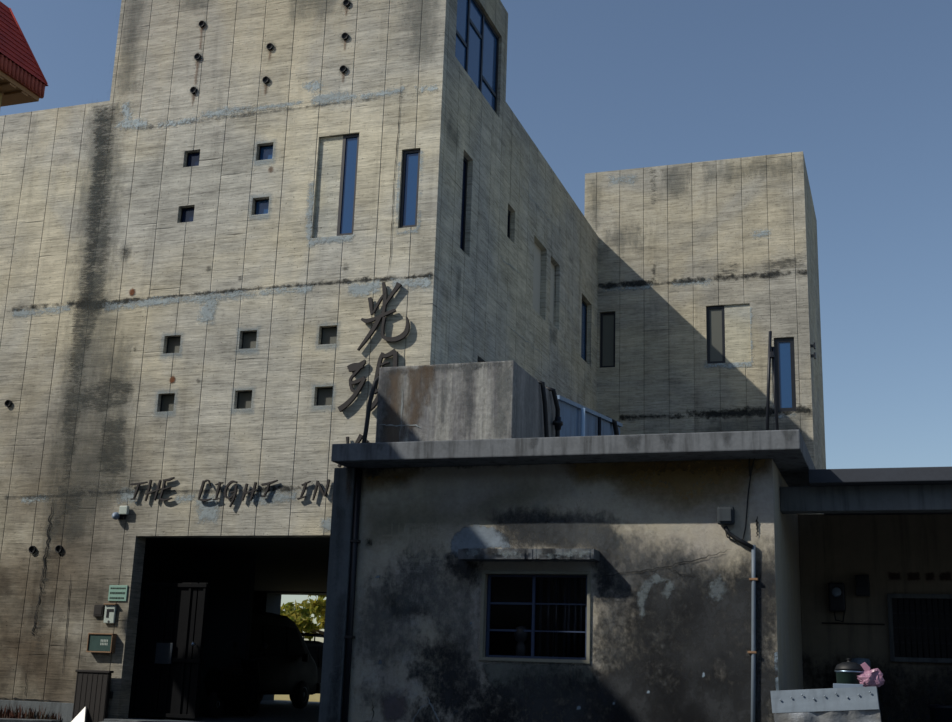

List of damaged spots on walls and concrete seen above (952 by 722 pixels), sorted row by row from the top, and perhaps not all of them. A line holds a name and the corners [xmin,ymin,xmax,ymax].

leakage [13,106,311,473]
leakage [348,278,431,297]
crack [256,484,300,492]
crack [6,496,53,635]
peeling [450,524,517,558]
leakage [358,510,778,722]
leakage [802,658,840,689]
leakage [872,664,952,722]